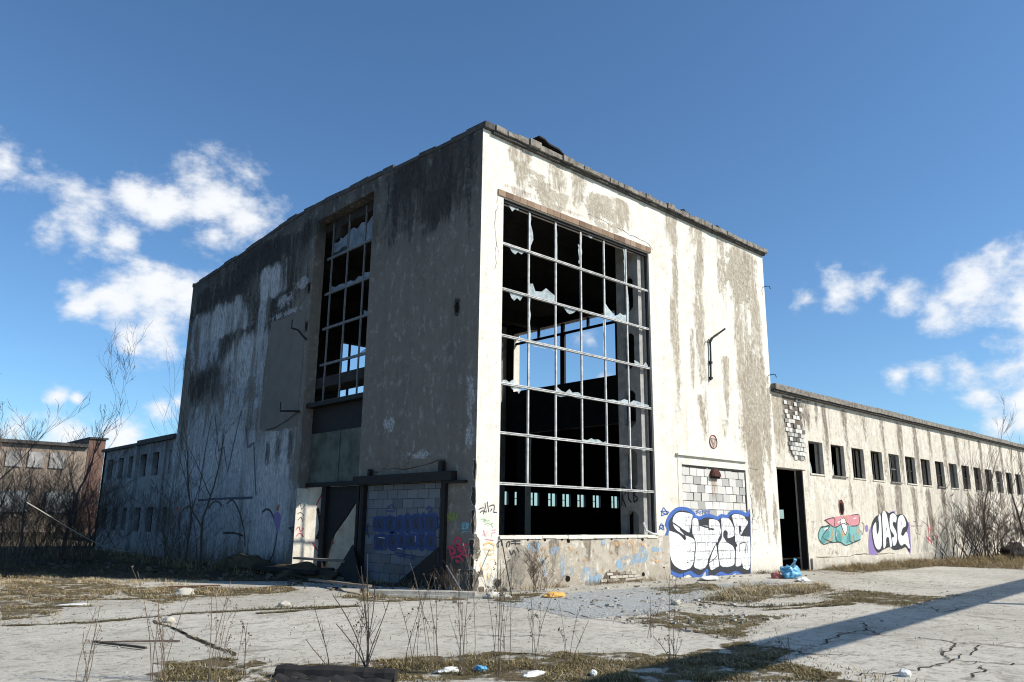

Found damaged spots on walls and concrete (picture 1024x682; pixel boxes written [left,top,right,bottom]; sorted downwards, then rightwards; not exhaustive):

leakage [387,132,477,245]
leakage [509,144,532,187]
leakage [539,162,601,219]
leakage [615,198,629,229]
leakage [183,221,319,406]
leakage [666,215,708,430]
leakage [265,431,293,461]
peeling [465,375,500,592]
leakage [801,401,829,459]
leakage [876,423,1024,537]